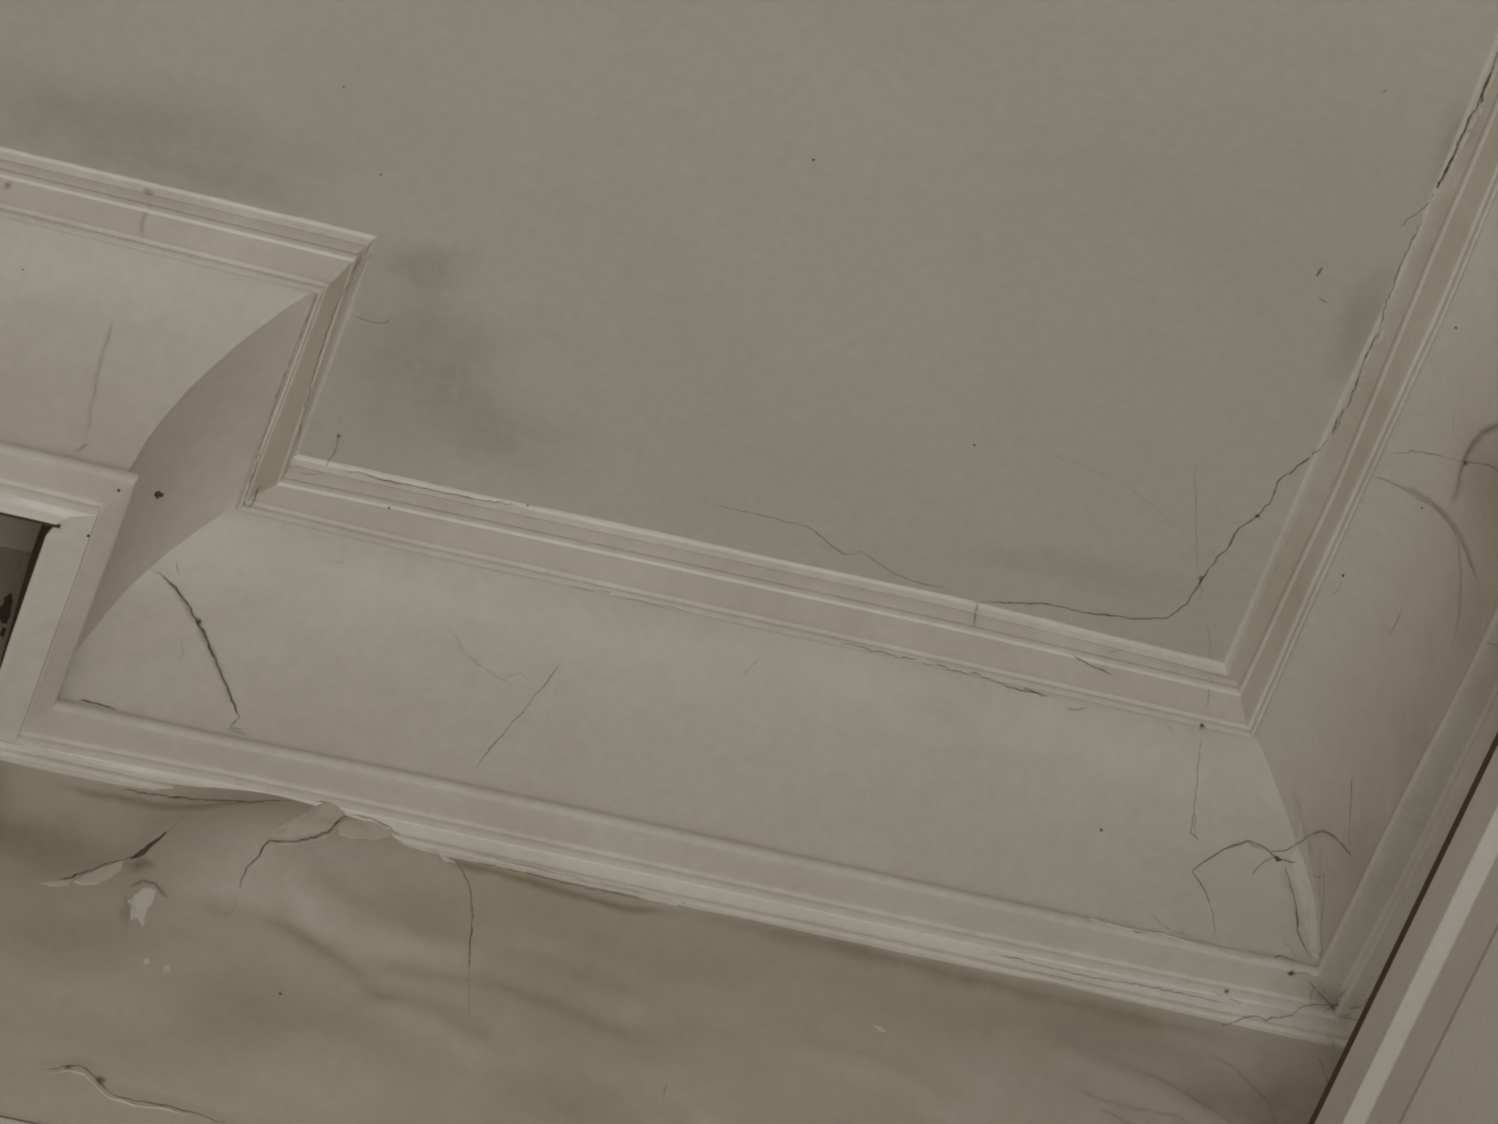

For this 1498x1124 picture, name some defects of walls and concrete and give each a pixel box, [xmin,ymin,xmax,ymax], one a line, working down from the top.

spalling [270,803,394,840]
spalling [40,832,167,886]
spalling [127,888,156,927]